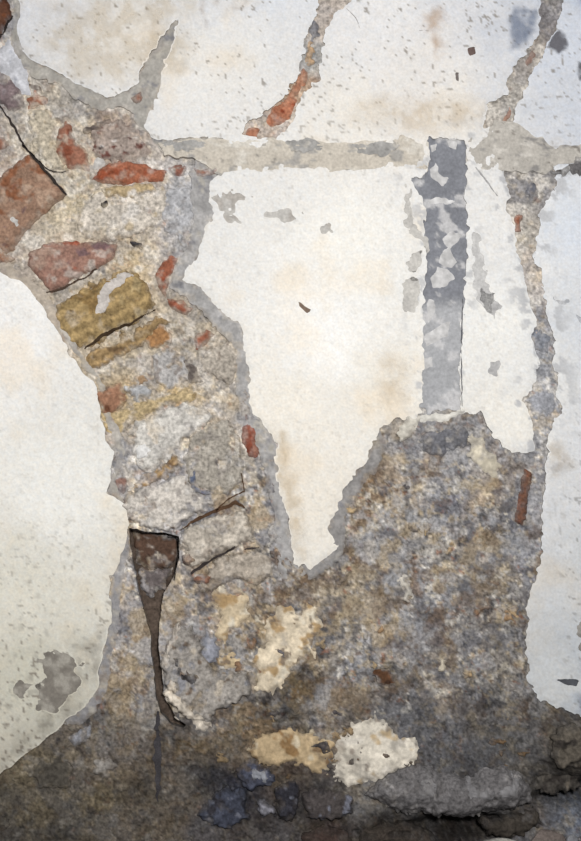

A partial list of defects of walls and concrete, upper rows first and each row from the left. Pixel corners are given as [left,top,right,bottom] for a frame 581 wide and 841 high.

spalling [242,0,351,139]
spalling [483,0,563,128]
crack [0,106,67,195]
spalling [0,0,309,616]
peeling [402,184,450,346]
peeling [430,163,448,186]
peeling [428,197,455,205]
peeling [430,231,462,288]
peeling [471,232,502,319]
spalling [504,168,562,451]
crack [130,473,259,802]
spalling [0,407,581,841]